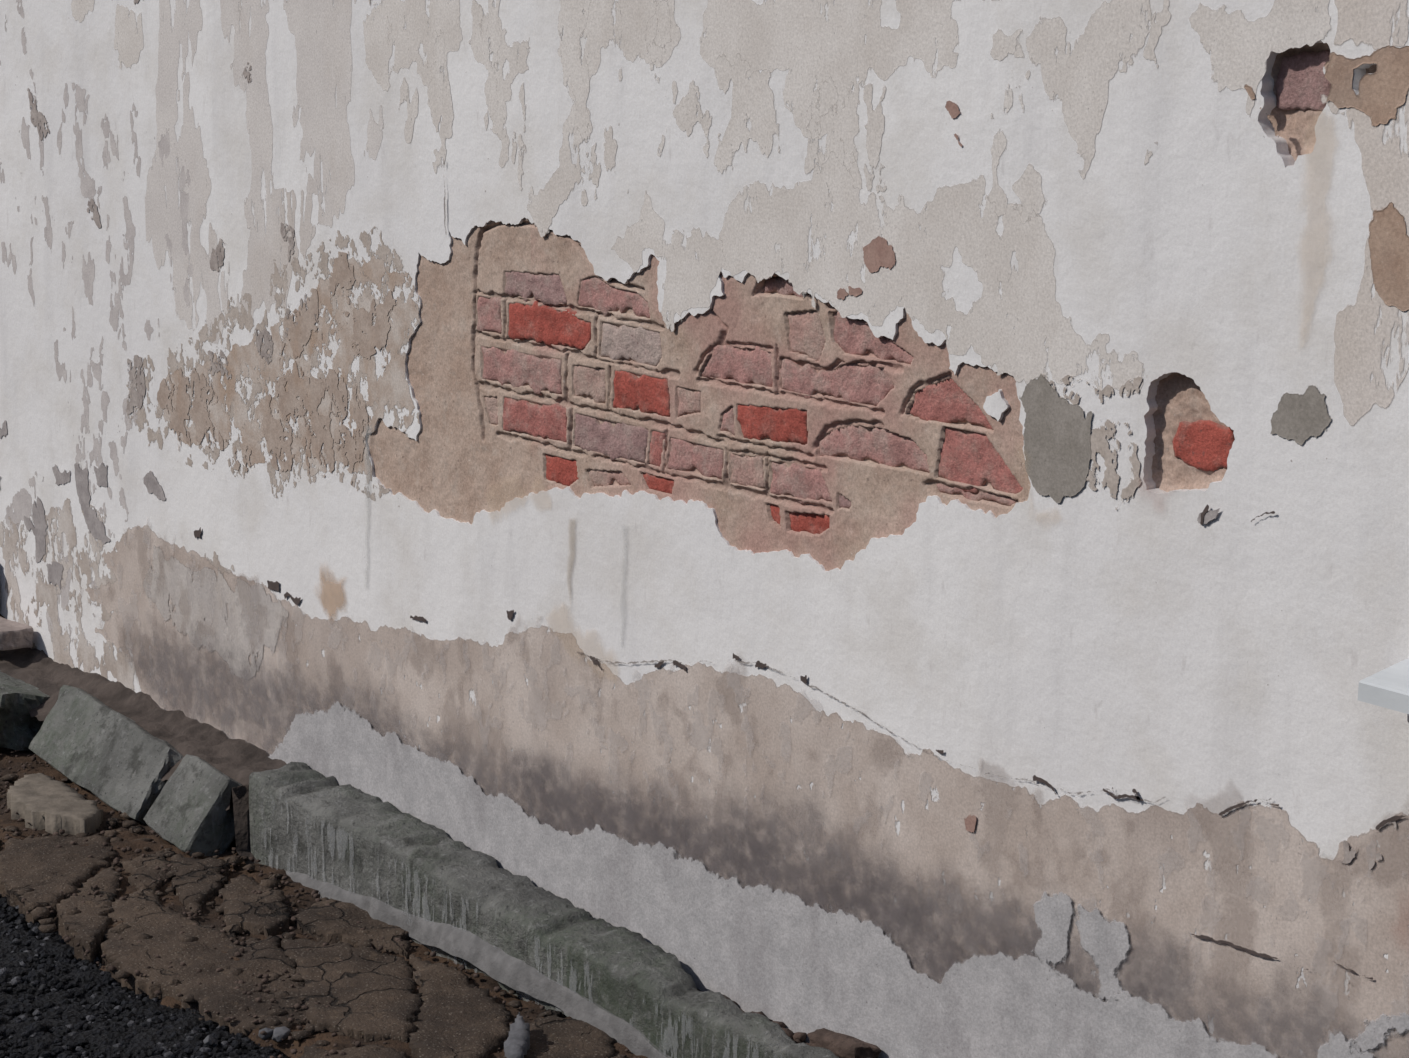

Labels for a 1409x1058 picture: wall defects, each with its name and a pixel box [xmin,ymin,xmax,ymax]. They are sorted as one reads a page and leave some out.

peeling [5,0,36,93]
peeling [19,117,44,173]
peeling [1,195,95,306]
flaking render [54,0,1171,571]
flaking render [1086,372,1235,510]
leakage [140,647,1094,994]
flaking render [0,472,1409,1058]
crack [1192,934,1373,984]
leakage [1180,1010,1323,1058]